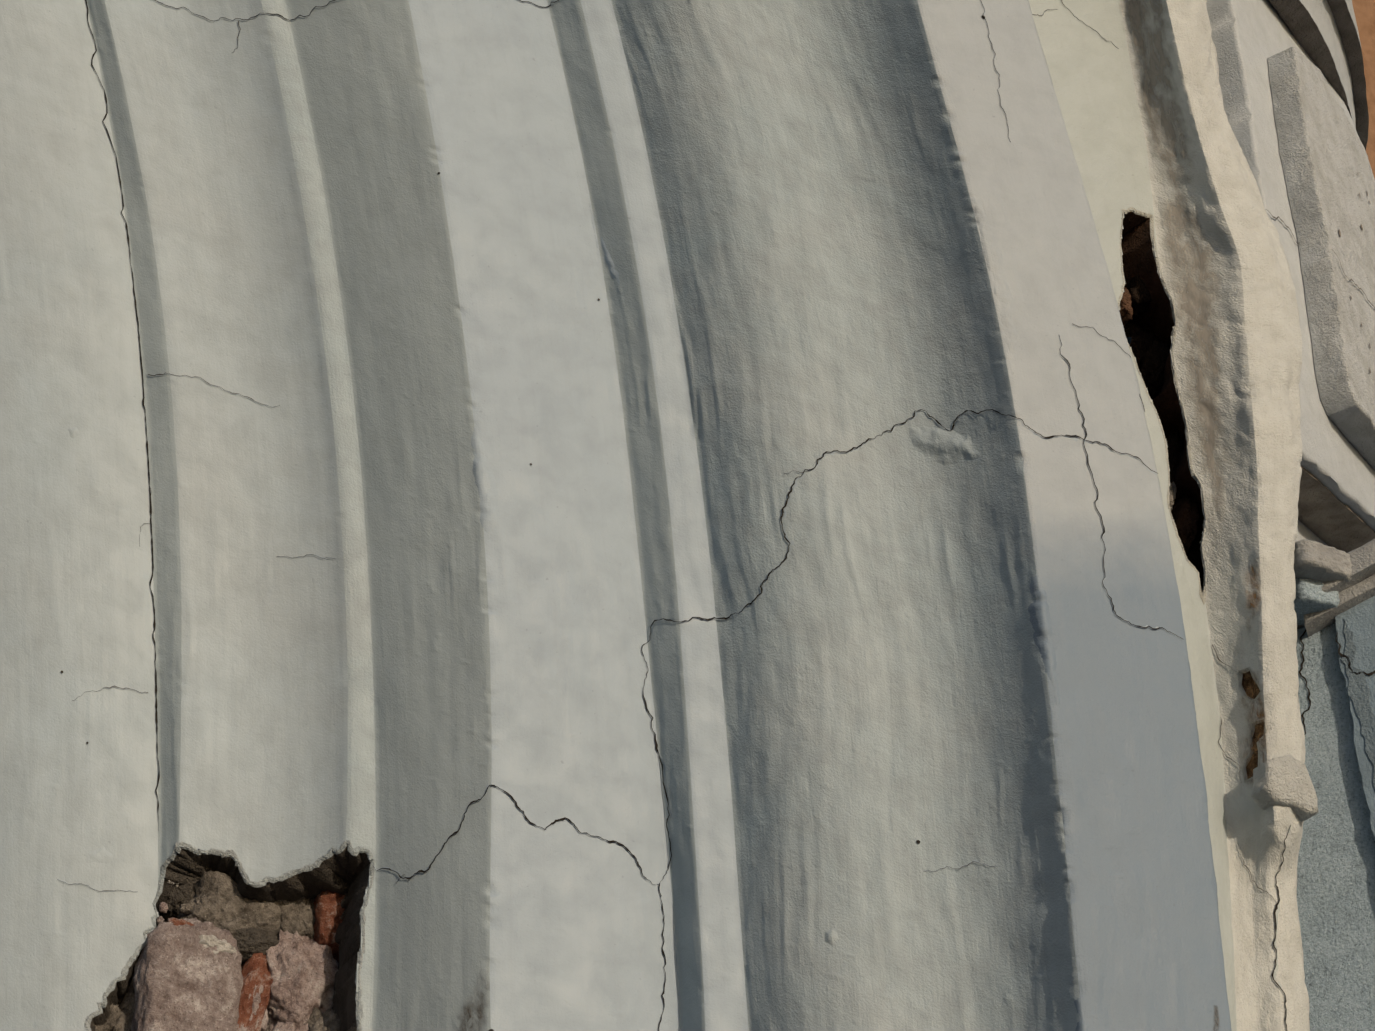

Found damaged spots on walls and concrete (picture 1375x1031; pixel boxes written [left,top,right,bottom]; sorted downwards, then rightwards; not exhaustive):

crack [155,0,335,53]
crack [980,0,1011,142]
crack [1032,0,1119,49]
crack [72,0,280,819]
spalling [1118,207,1207,605]
crack [373,323,1240,1031]
crack [1299,629,1375,735]
spalling [84,840,376,1031]
crack [1238,825,1291,1031]